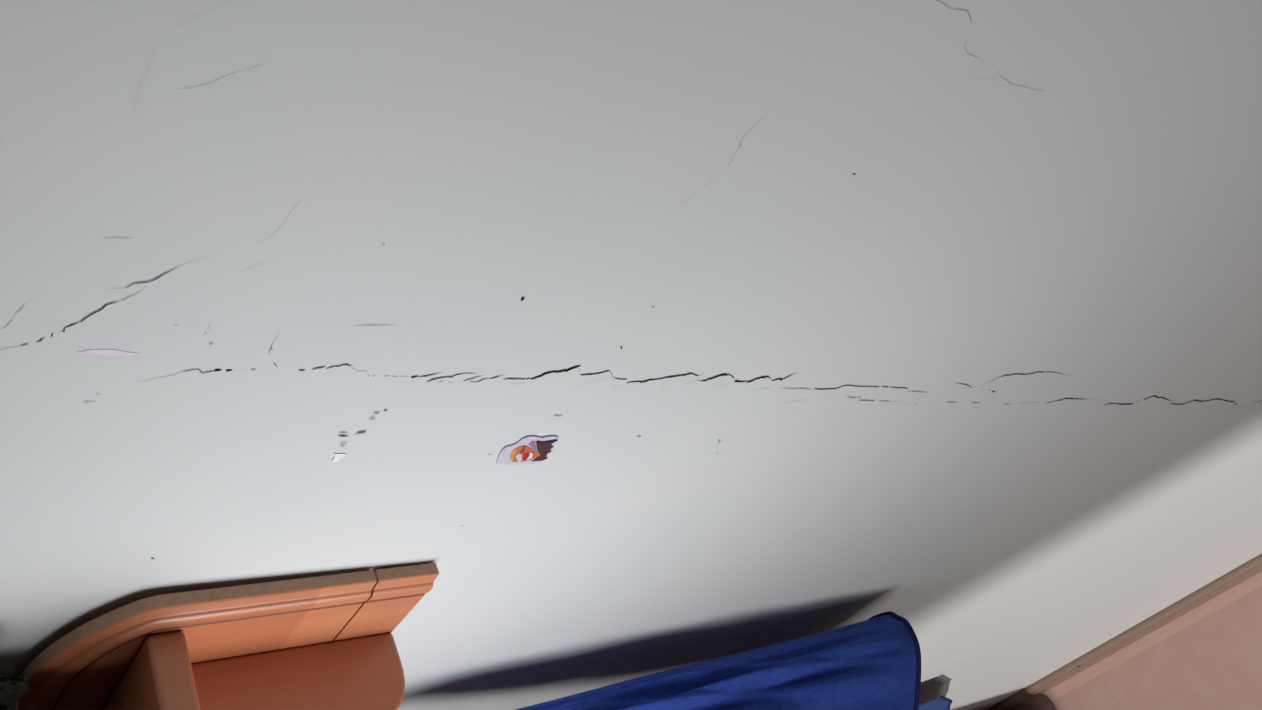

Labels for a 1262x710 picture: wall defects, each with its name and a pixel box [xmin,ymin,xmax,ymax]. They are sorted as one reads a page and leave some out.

crack [4,269,174,347]
crack [183,346,352,373]
crack [384,365,976,403]
crack [1001,371,1238,405]